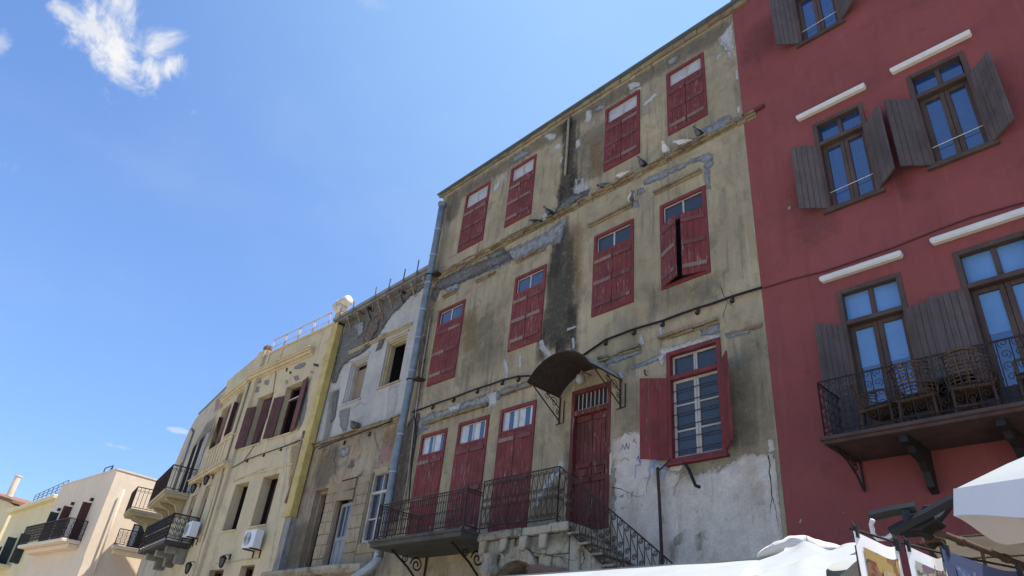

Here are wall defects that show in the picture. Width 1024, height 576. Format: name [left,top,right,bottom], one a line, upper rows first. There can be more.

water stain [558,120,603,207]
flaking render [632,151,714,208]
flaking render [330,187,592,524]
water stain [538,223,576,360]
flaking render [609,431,783,567]
crack [768,455,779,530]